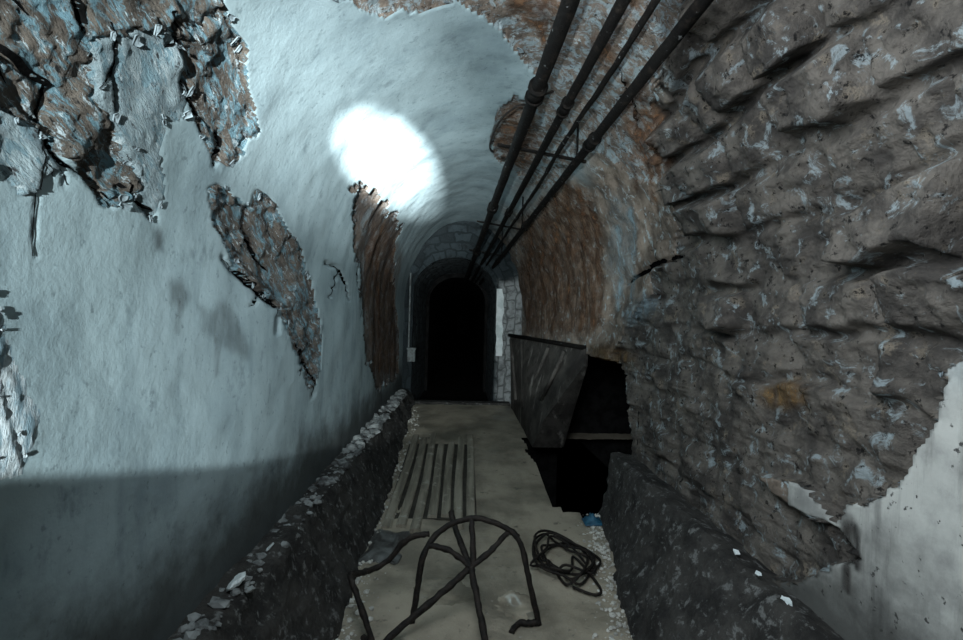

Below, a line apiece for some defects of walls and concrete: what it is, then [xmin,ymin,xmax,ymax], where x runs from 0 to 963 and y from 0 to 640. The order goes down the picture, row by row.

flaking render [0,0,260,222]
flaking render [353,0,561,75]
peeling [0,306,40,480]
flaking render [207,185,322,389]
flaking render [348,181,404,393]
flaking render [490,0,963,586]